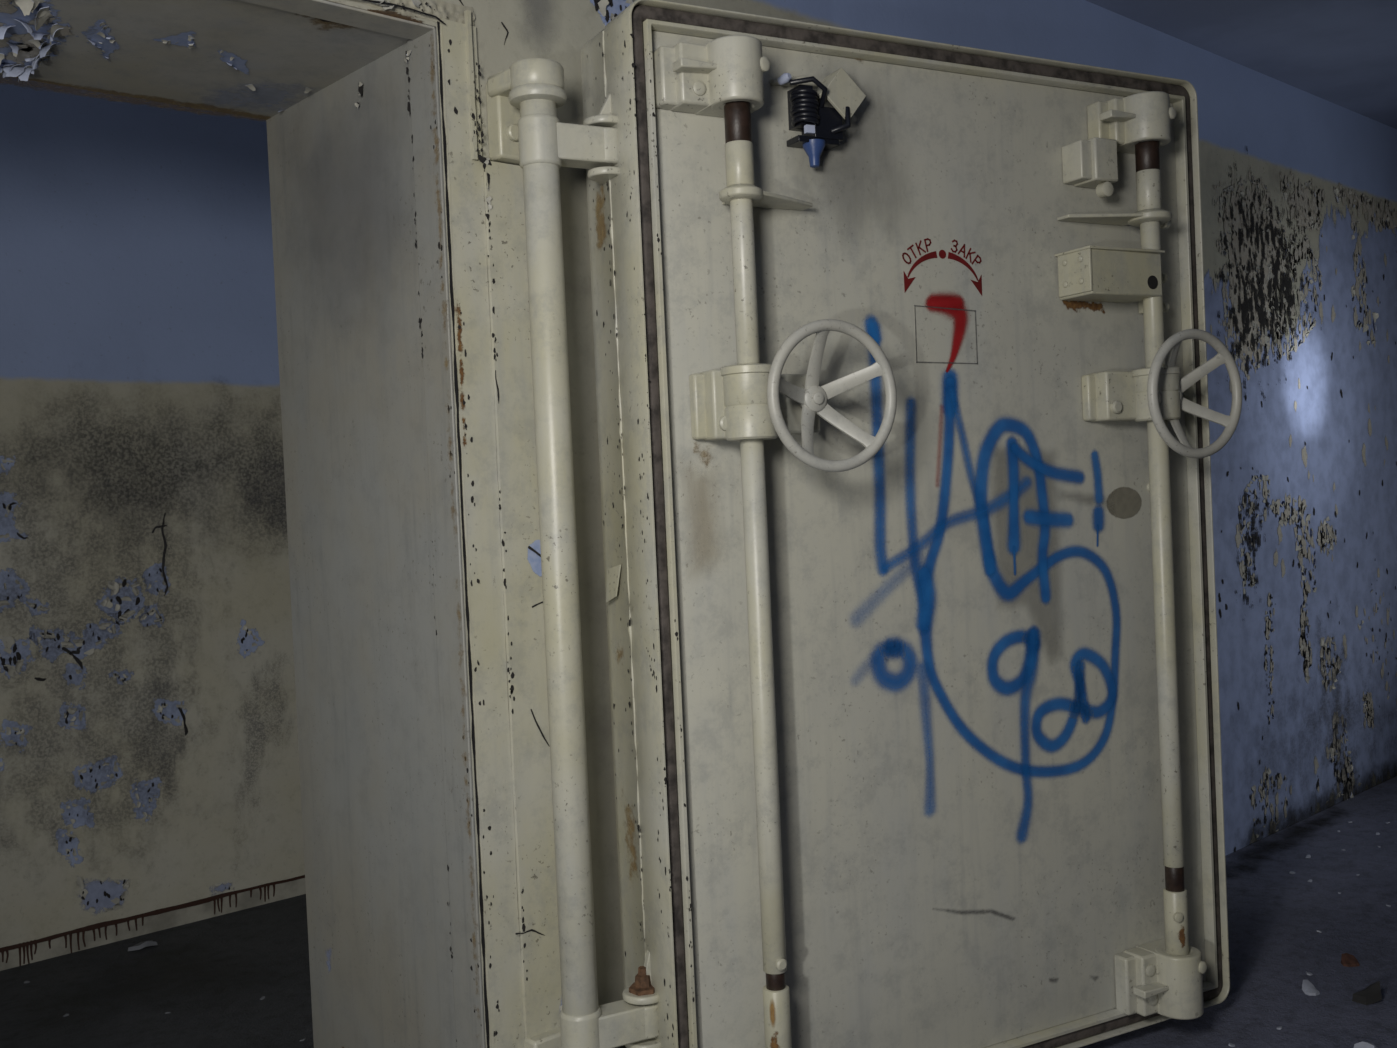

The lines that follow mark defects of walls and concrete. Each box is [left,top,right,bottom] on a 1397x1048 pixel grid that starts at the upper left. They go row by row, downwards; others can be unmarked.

peeling [0,0,119,82]
flaking render [350,0,475,26]
peeling [590,0,636,47]
peeling [454,62,495,284]
crack [152,513,168,596]
water stain [77,422,287,525]
crack [362,0,545,1048]
peeling [1204,161,1397,856]
crack [62,647,83,669]
crack [178,707,188,736]
crack [531,709,550,747]
peeling [55,755,162,913]